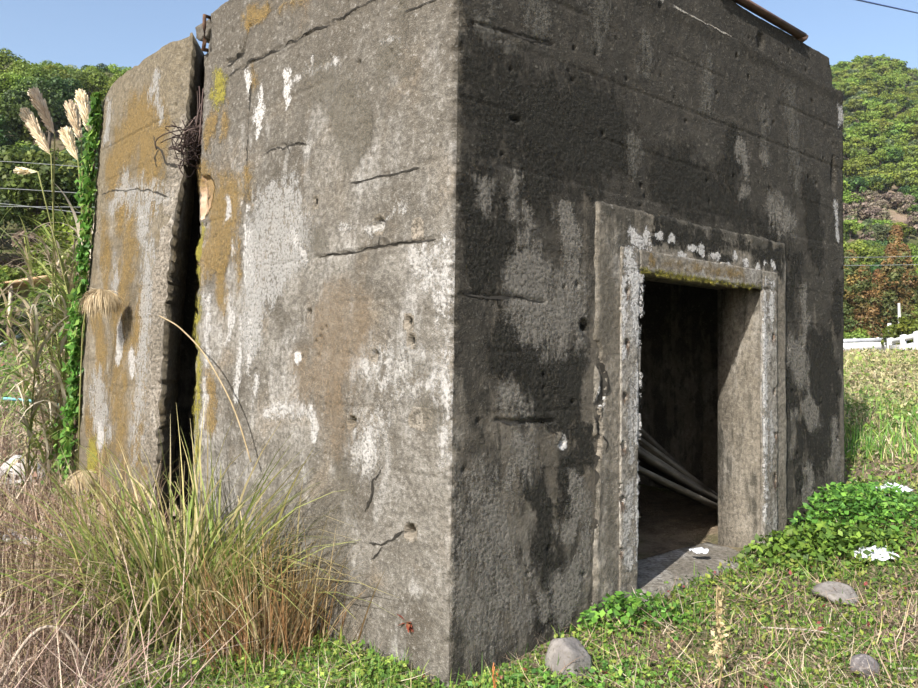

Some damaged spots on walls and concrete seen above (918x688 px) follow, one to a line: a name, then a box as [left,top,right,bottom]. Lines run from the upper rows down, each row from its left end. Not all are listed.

leakage [103,96,113,147]
leakage [147,68,164,124]
crack [225,0,372,166]
spalling [200,175,215,220]
leakage [106,169,169,464]
leakage [344,0,844,636]
leakage [89,363,112,452]
peeling [621,225,776,524]
peeling [622,362,643,571]
leakage [304,508,354,612]
crack [369,531,403,560]